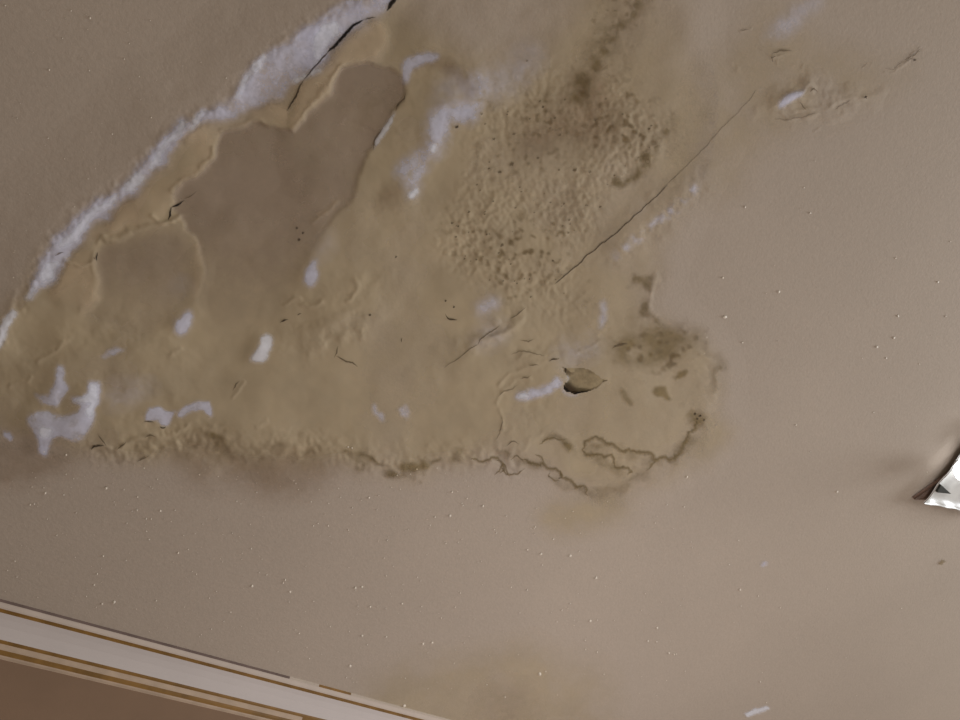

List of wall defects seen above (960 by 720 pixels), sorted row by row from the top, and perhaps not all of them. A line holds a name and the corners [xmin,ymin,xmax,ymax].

crack [288,0,396,109]
crack [556,92,755,283]
peeling [34,199,112,285]
peeling [0,312,15,345]
peeling [178,314,190,333]
peeling [253,336,272,361]
crack [448,308,525,365]
peeling [36,369,99,454]
peeling [147,403,211,424]
leakage [476,437,587,495]
leakage [583,422,697,474]